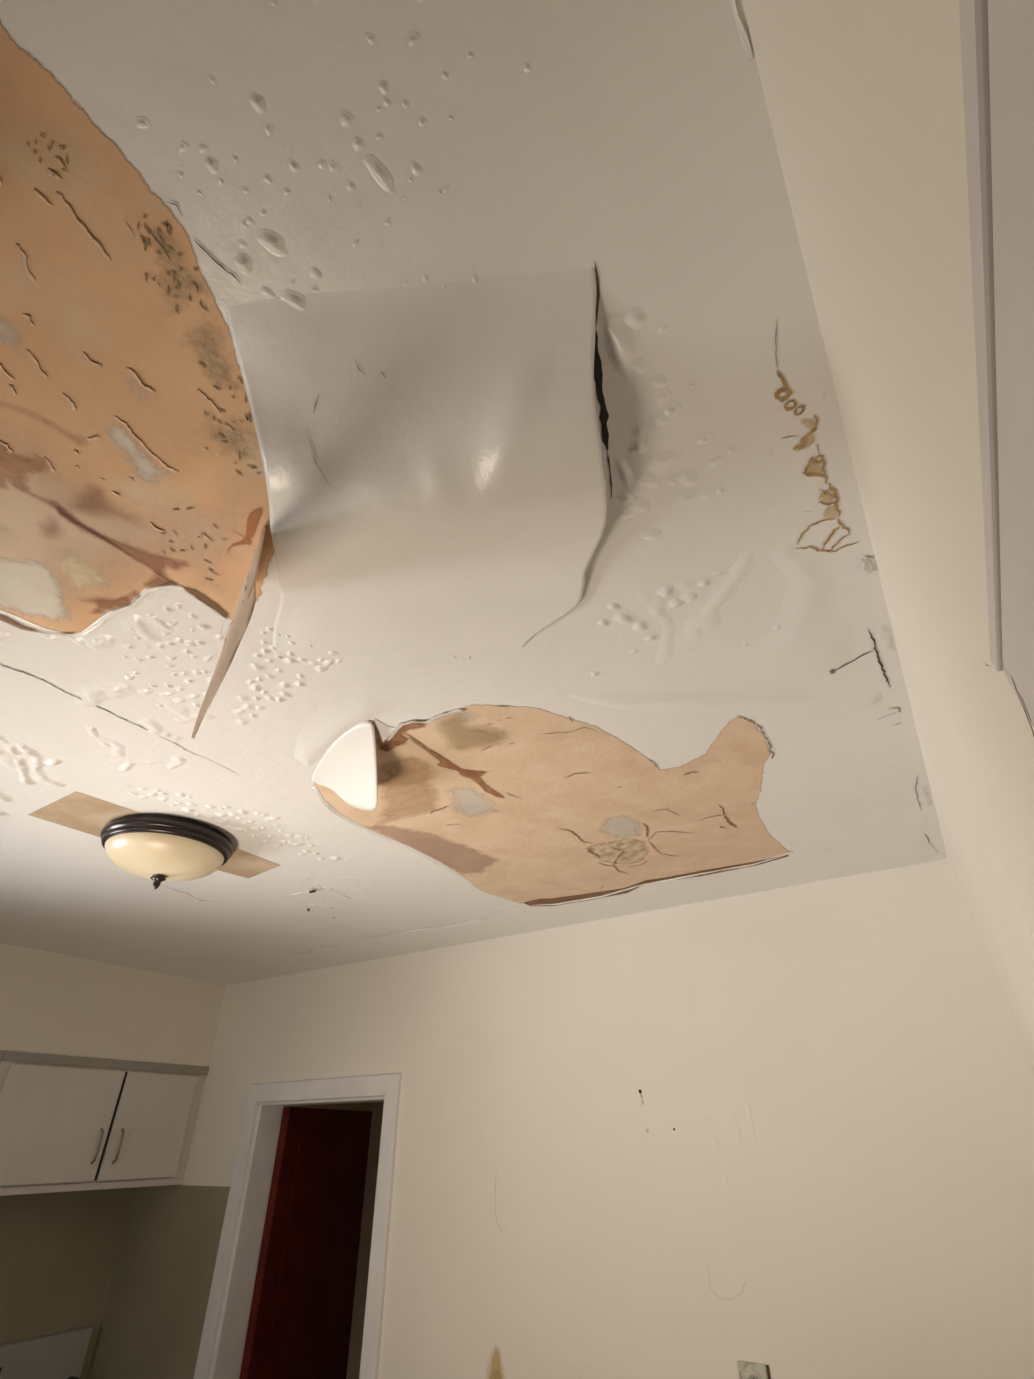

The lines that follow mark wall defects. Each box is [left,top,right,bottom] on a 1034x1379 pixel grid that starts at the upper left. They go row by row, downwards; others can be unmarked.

peeling [137,214,209,314]
peeling [74,416,179,482]
peeling [196,377,261,476]
peeling [0,555,106,621]
spalling [589,816,647,864]
leakage [490,1352,502,1379]